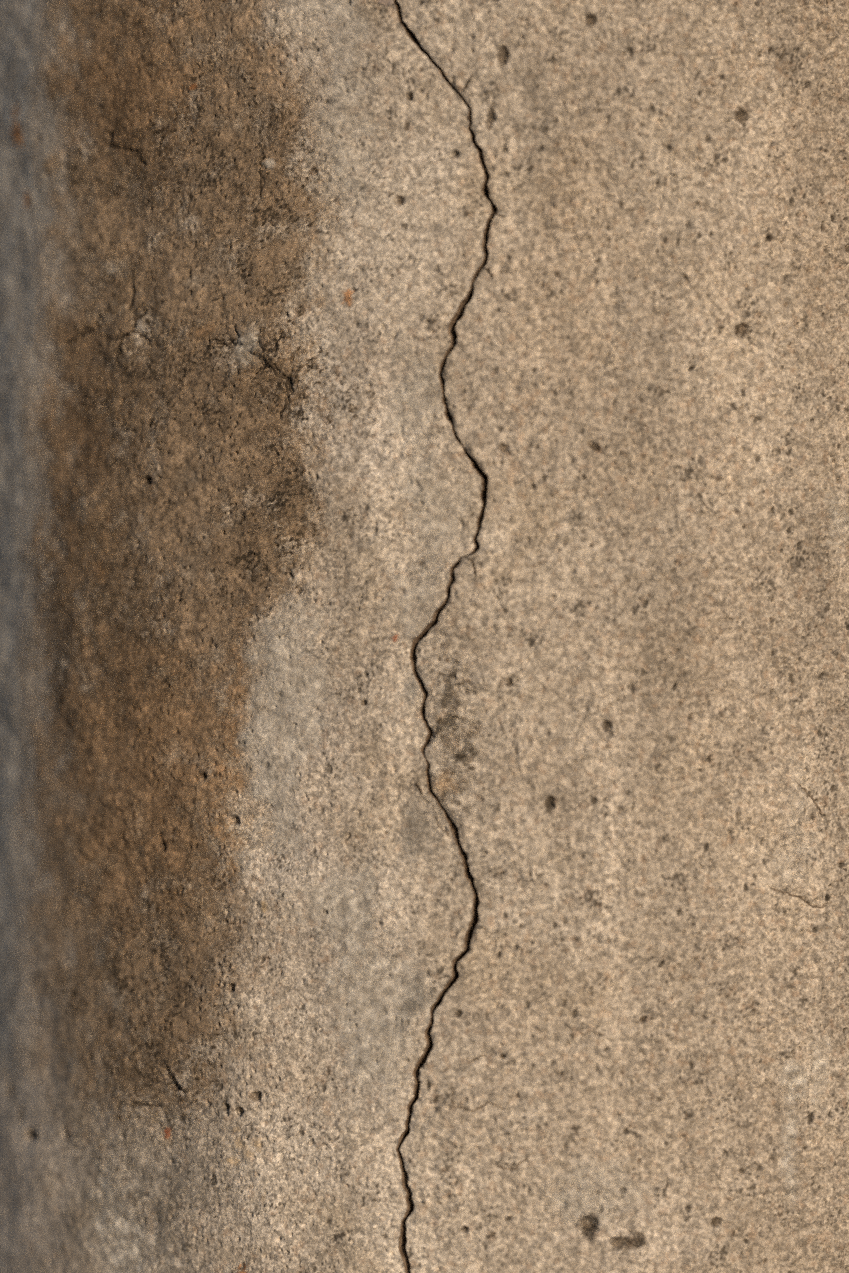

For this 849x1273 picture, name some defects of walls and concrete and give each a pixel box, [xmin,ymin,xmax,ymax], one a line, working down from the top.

leakage [0,0,375,1139]
crack [394,0,505,1273]